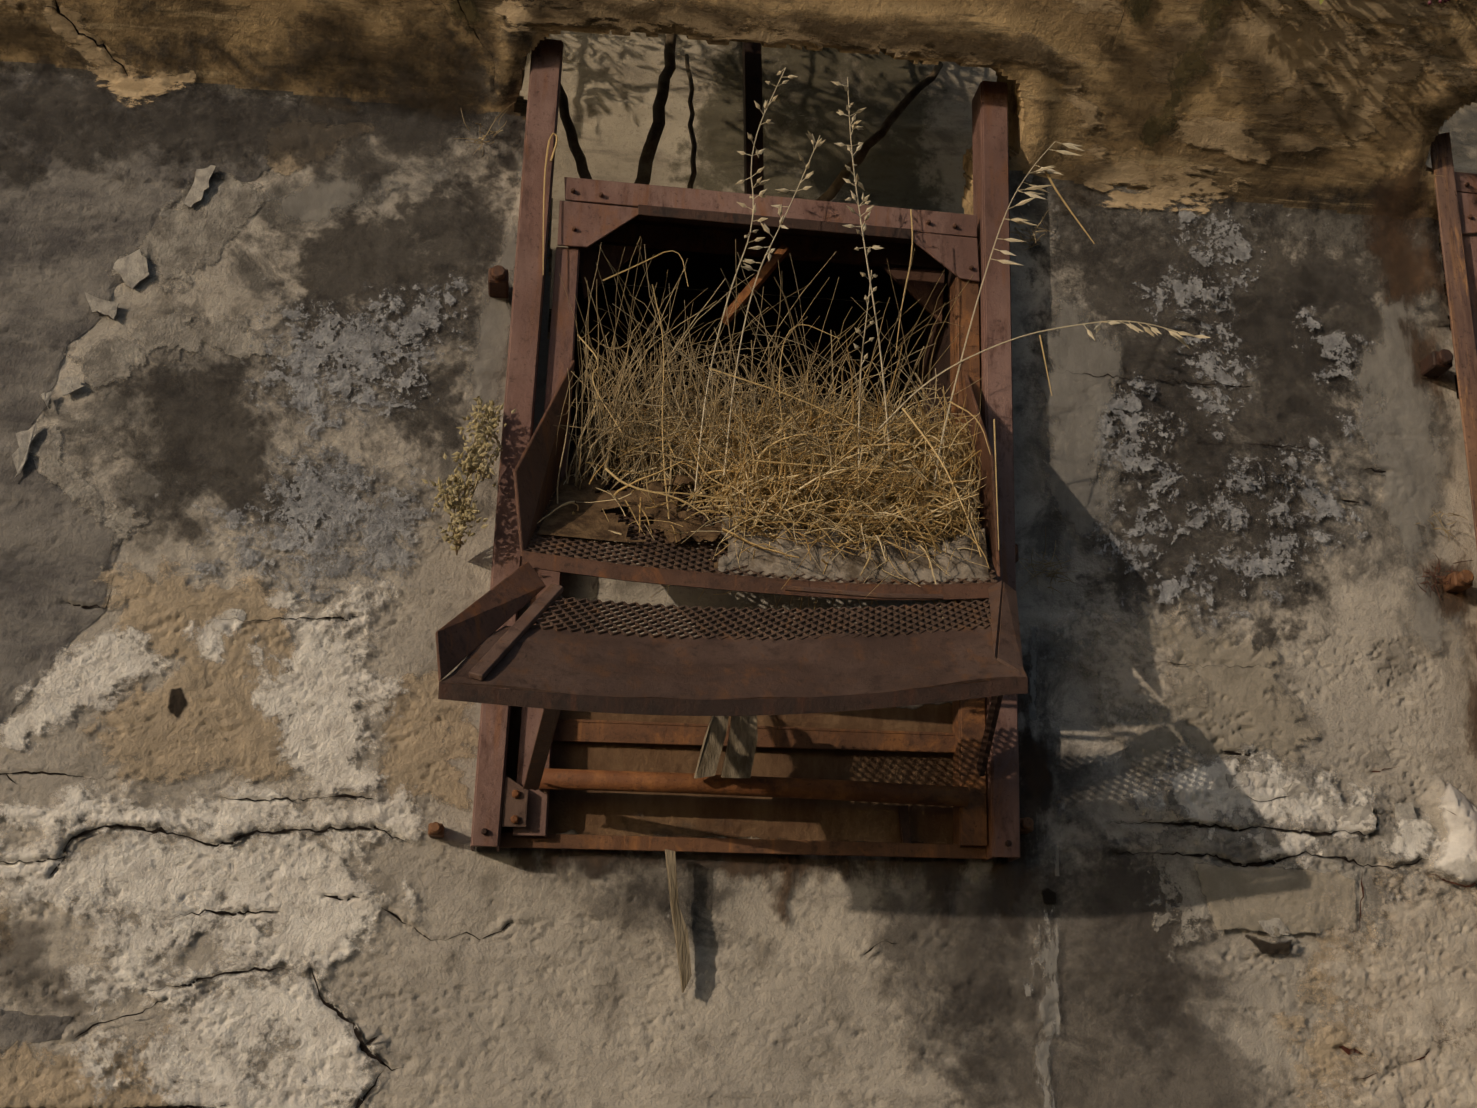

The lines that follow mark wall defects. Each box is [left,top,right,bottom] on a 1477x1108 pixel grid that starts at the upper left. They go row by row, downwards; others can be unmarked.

crack [46,0,128,76]
leakage [1121,0,1152,35]
peeling [0,0,344,784]
leakage [1029,185,1464,744]
crack [0,771,130,784]
spalling [376,671,479,810]
crack [0,794,406,876]
crack [1108,796,1477,933]
crack [172,909,279,919]
crack [324,895,512,941]
crack [75,965,403,1108]
crack [1339,1038,1455,1079]